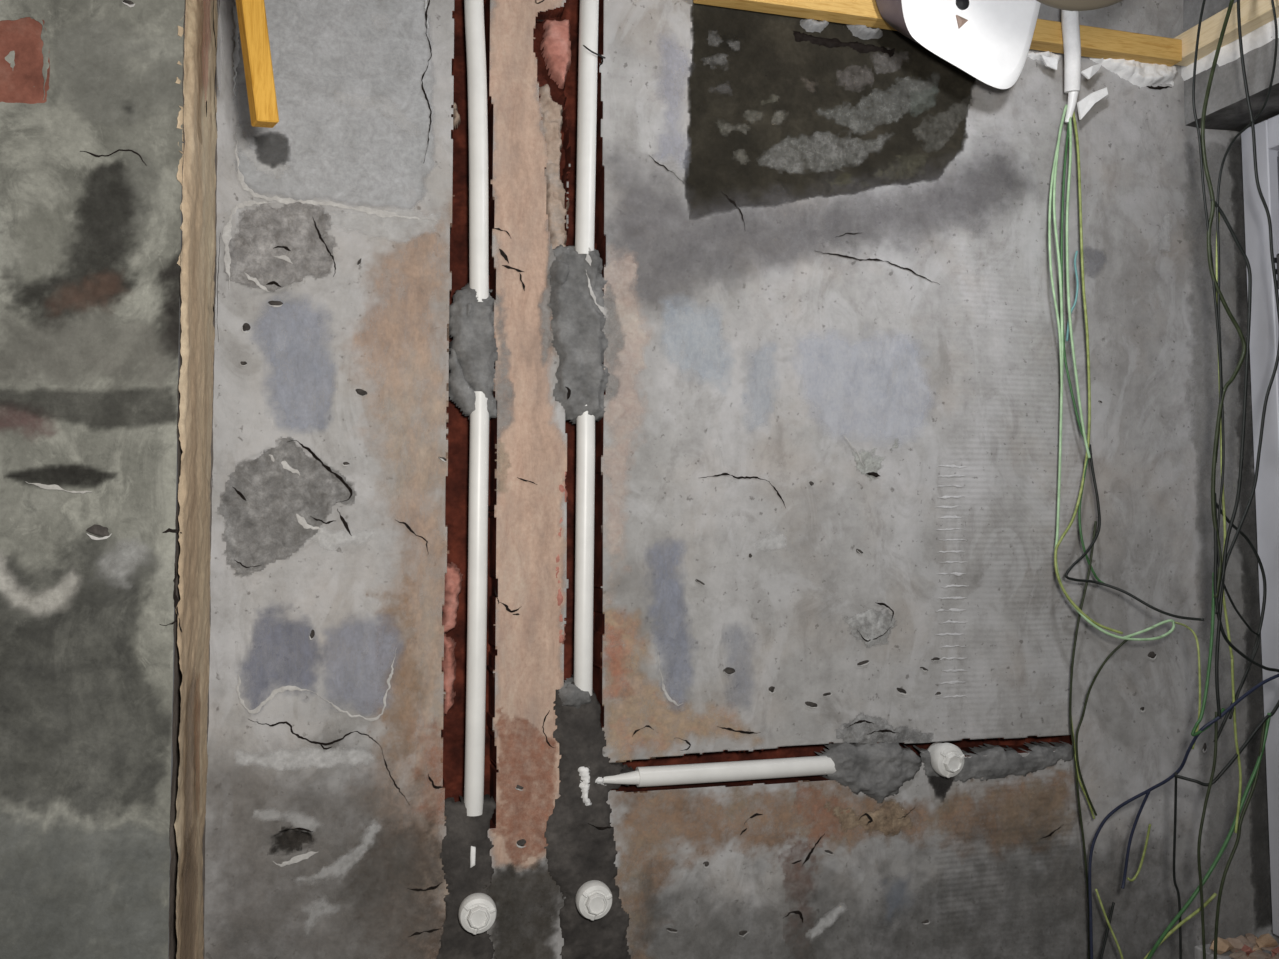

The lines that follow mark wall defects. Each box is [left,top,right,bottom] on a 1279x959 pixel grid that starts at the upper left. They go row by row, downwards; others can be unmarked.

peeling [684,3,976,219]
leakage [18,162,136,327]
crack [817,233,937,283]
leakage [160,255,180,356]
leakage [0,391,175,427]
leakage [7,465,113,487]
peeling [174,0,356,959]
crack [701,473,786,508]
spalling [845,602,896,647]
crack [249,719,446,806]